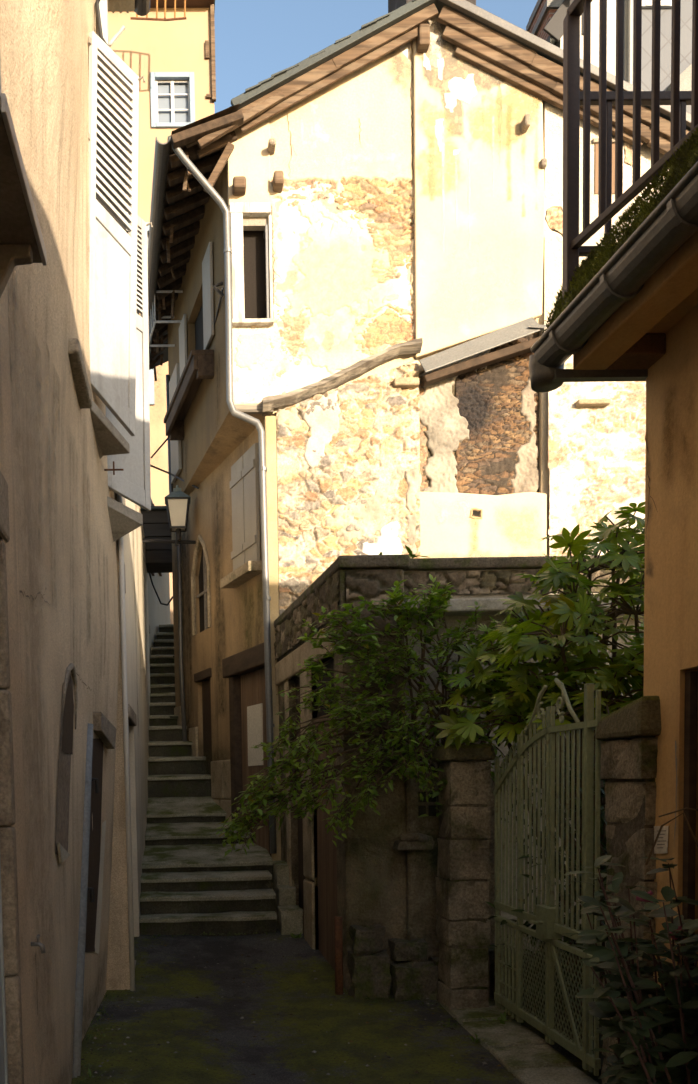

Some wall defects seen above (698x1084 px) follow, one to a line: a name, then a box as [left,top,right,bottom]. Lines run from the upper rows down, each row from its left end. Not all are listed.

flaking render [423,53,477,156]
leakage [418,15,539,210]
flaking render [232,173,428,615]
flaking render [456,332,646,556]